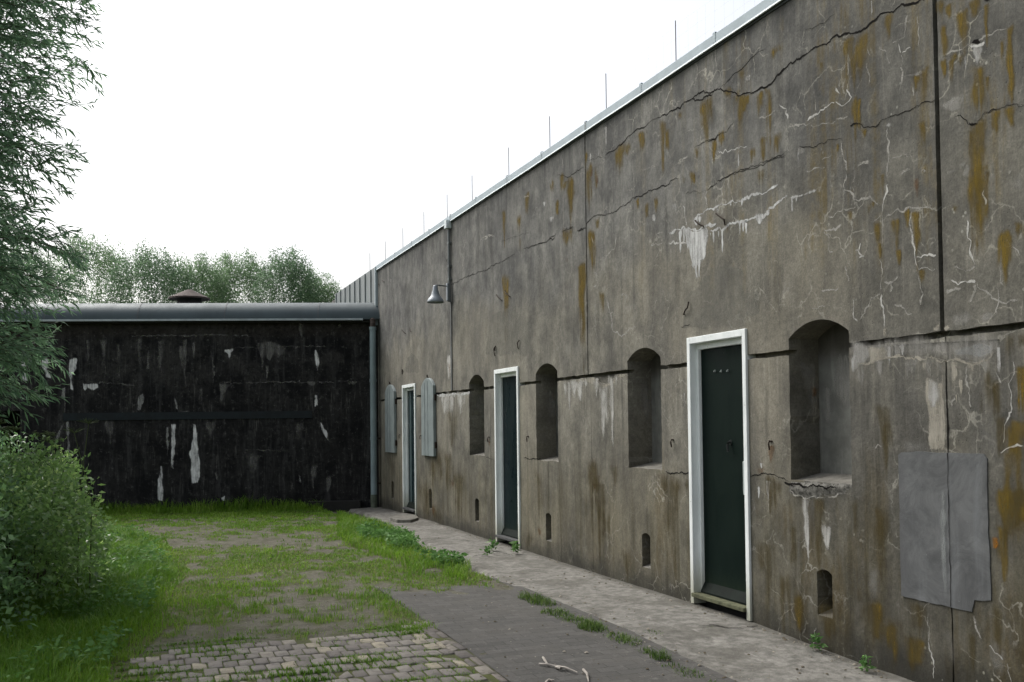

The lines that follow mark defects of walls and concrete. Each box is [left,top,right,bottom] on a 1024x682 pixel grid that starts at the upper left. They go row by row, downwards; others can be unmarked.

crack [559,0,920,178]
crack [955,103,1022,126]
crack [446,100,934,285]
damp [669,185,815,277]
peeling [62,358,98,398]
crack [943,363,951,450]
peeling [158,424,176,500]
peeling [189,426,200,483]
spalling [784,481,852,499]